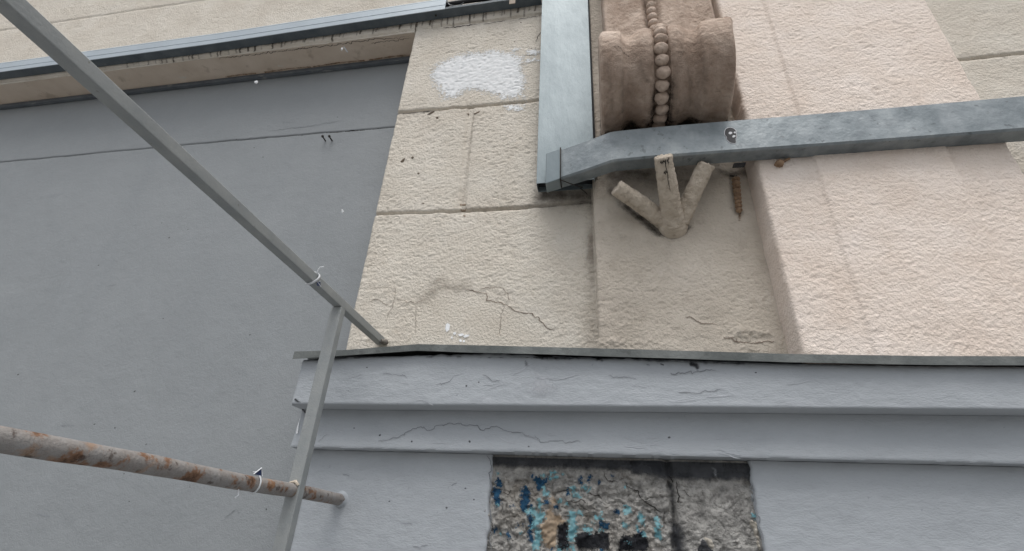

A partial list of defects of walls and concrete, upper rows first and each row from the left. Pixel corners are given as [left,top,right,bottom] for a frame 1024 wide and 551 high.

crack [470,287,559,336]
crack [671,369,723,394]
crack [379,423,581,443]
spalling [484,446,764,551]